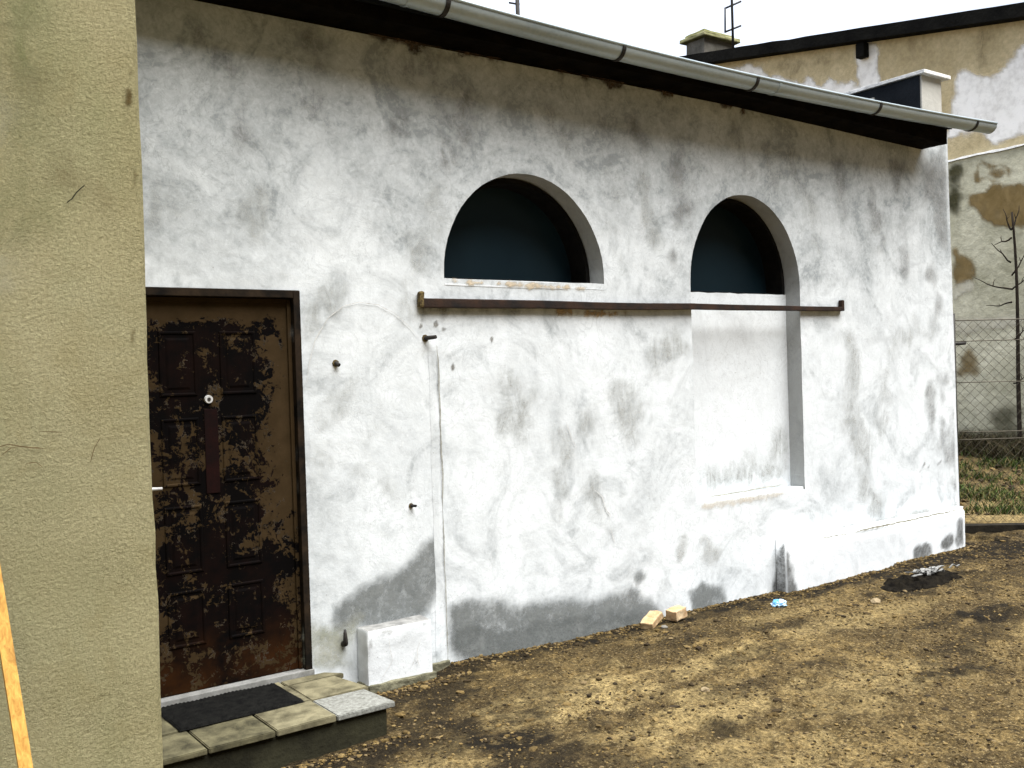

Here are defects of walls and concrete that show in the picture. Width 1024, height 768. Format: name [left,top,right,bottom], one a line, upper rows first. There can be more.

peeling [734,44,880,93]
peeling [952,45,1024,144]
spalling [969,163,1024,227]
spalling [952,249,975,299]
spalling [955,316,1024,335]
leakage [914,519,963,558]
leakage [773,544,797,593]
leakage [312,541,436,665]
leakage [451,573,658,657]